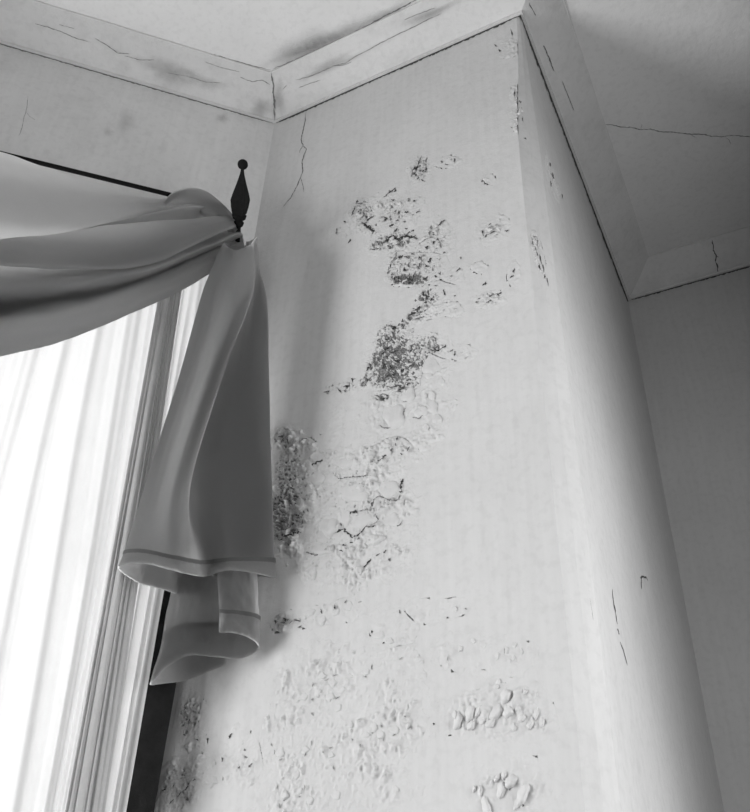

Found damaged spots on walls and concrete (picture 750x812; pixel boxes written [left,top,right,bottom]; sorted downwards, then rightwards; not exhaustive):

crack [1,0,750,302]
spalling [264,148,521,650]
peeling [154,687,263,812]